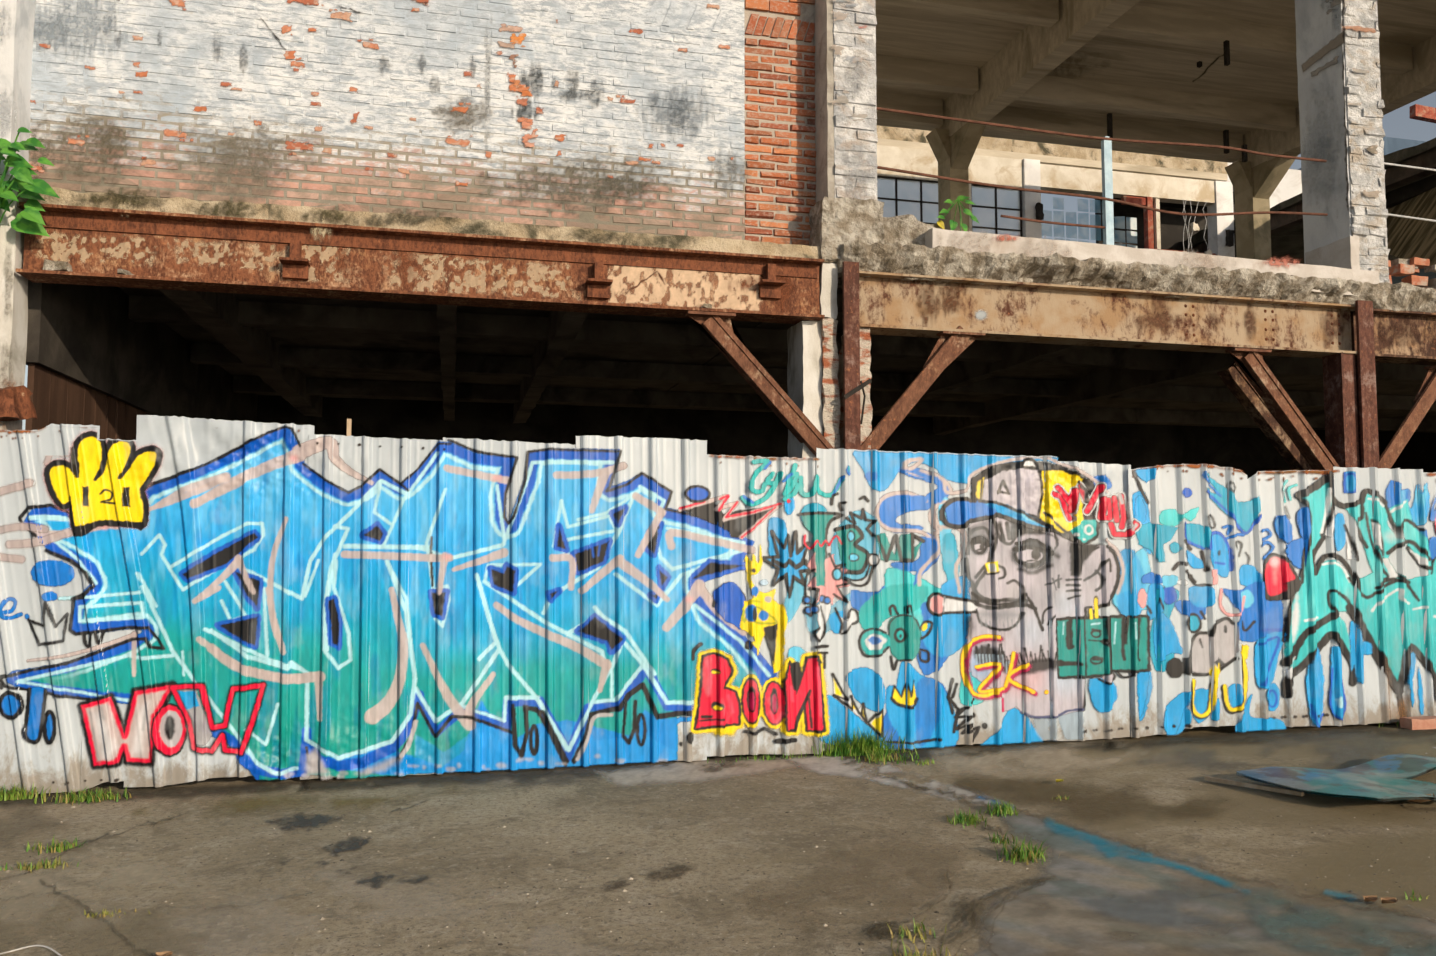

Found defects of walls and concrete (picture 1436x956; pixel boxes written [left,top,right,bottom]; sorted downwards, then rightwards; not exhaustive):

peeling [287,0,353,22]
peeling [281,25,316,71]
spalling [496,23,566,156]
flaking render [708,0,816,246]
damp [32,118,126,180]
damp [507,159,653,209]
damp [192,200,256,216]
rust [881,279,967,323]
spalling [836,240,1436,317]
rust [1139,297,1178,330]
rust [1245,304,1256,334]
rust [1325,309,1343,345]